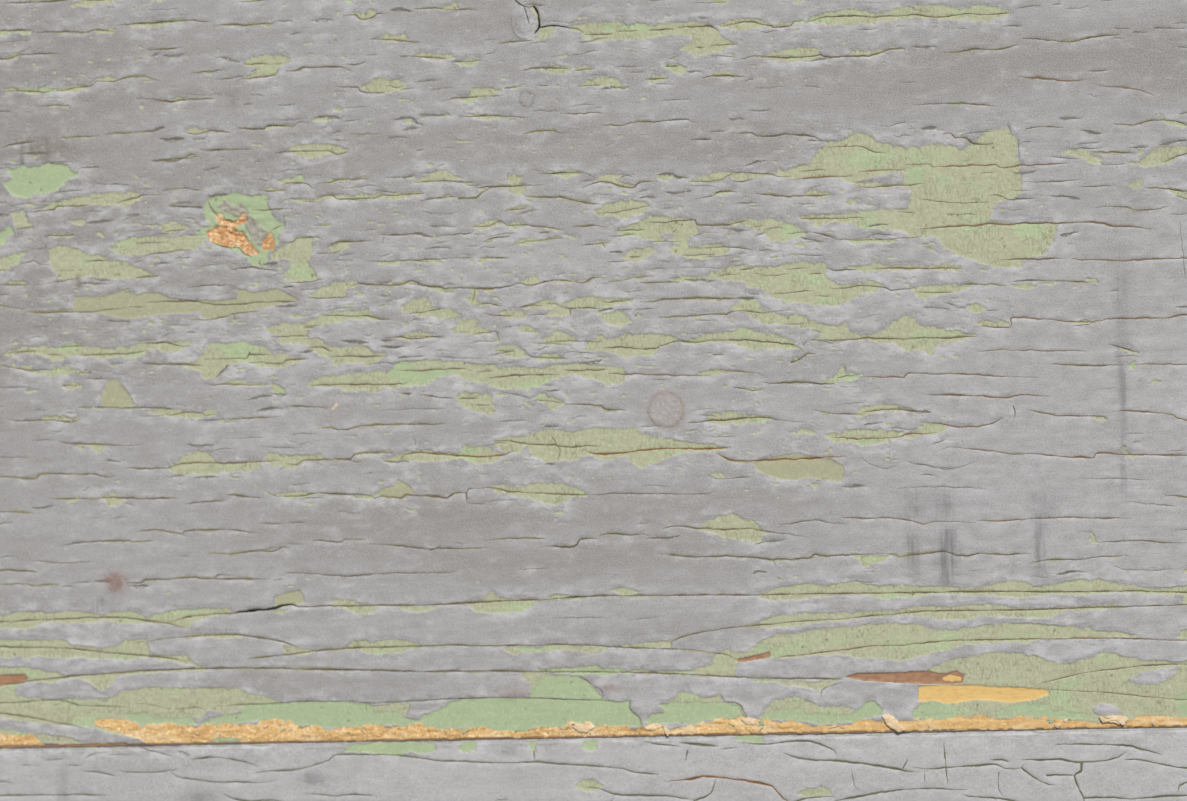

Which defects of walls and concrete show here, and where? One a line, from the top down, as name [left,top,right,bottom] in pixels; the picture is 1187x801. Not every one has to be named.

peeling [0,111,1073,520]
crack [0,0,1187,495]
crack [0,356,1187,801]
peeling [700,513,765,544]